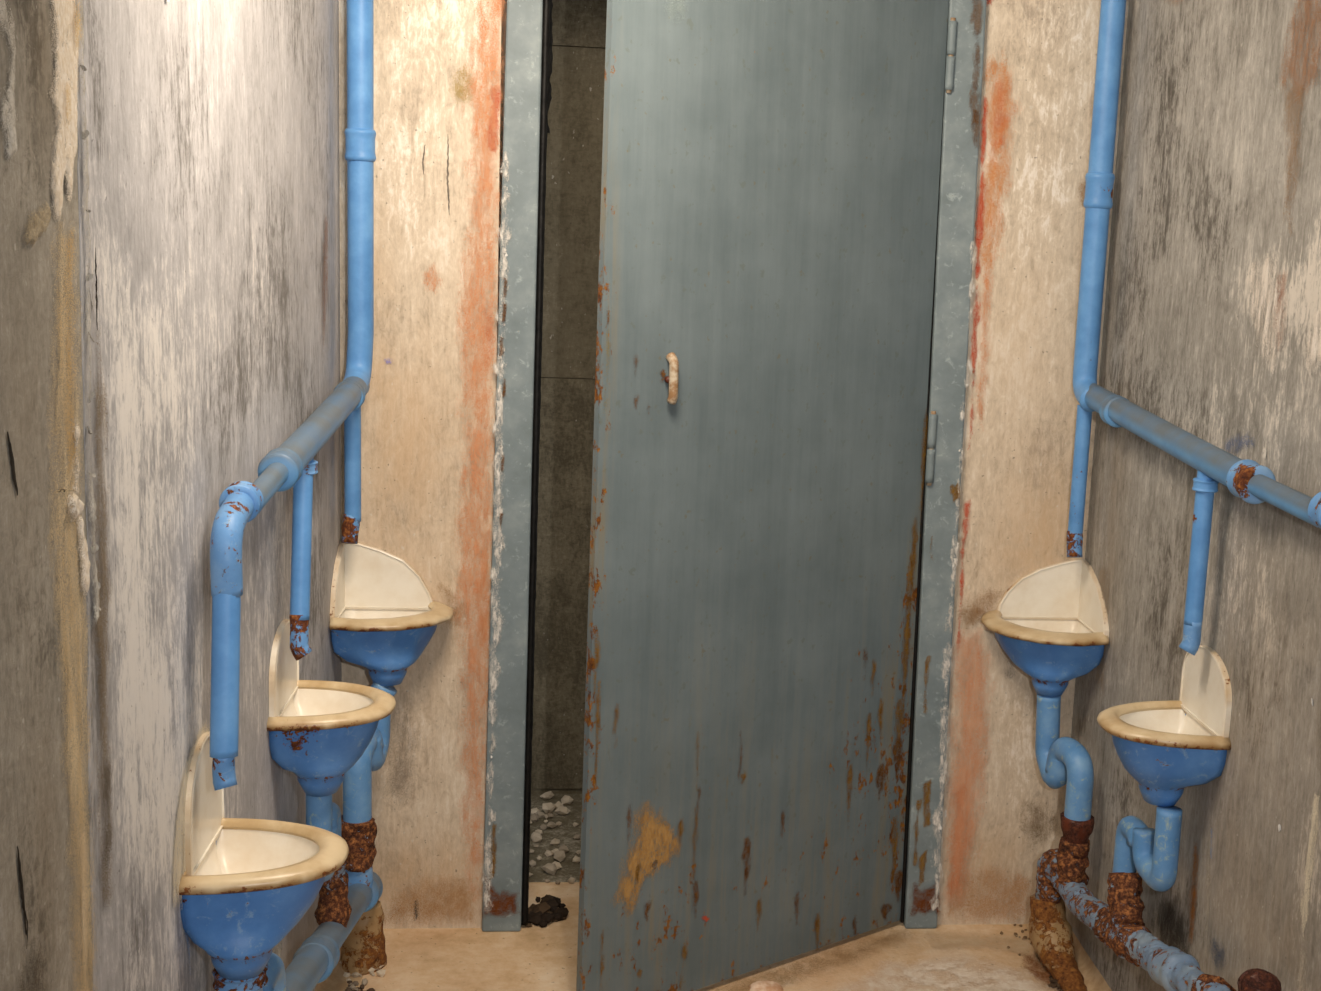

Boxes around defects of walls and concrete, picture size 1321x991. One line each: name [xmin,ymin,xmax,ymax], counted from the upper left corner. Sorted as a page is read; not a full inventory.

crack [92,247,100,331]
corrosion [967,50,1022,450]
crack [7,432,18,496]
corrosion [437,0,522,920]
crack [17,846,28,949]